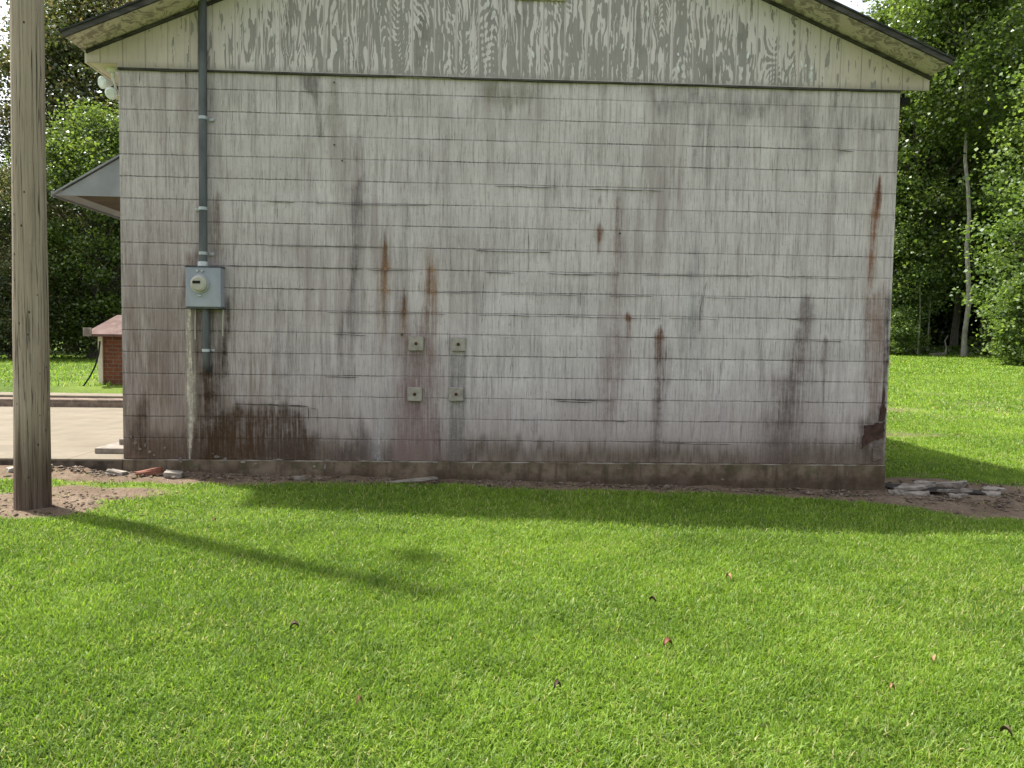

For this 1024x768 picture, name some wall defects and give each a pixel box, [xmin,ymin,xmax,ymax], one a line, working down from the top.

corrosion [870,177,880,267]
damp [129,308,325,460]
spalling [861,388,887,462]